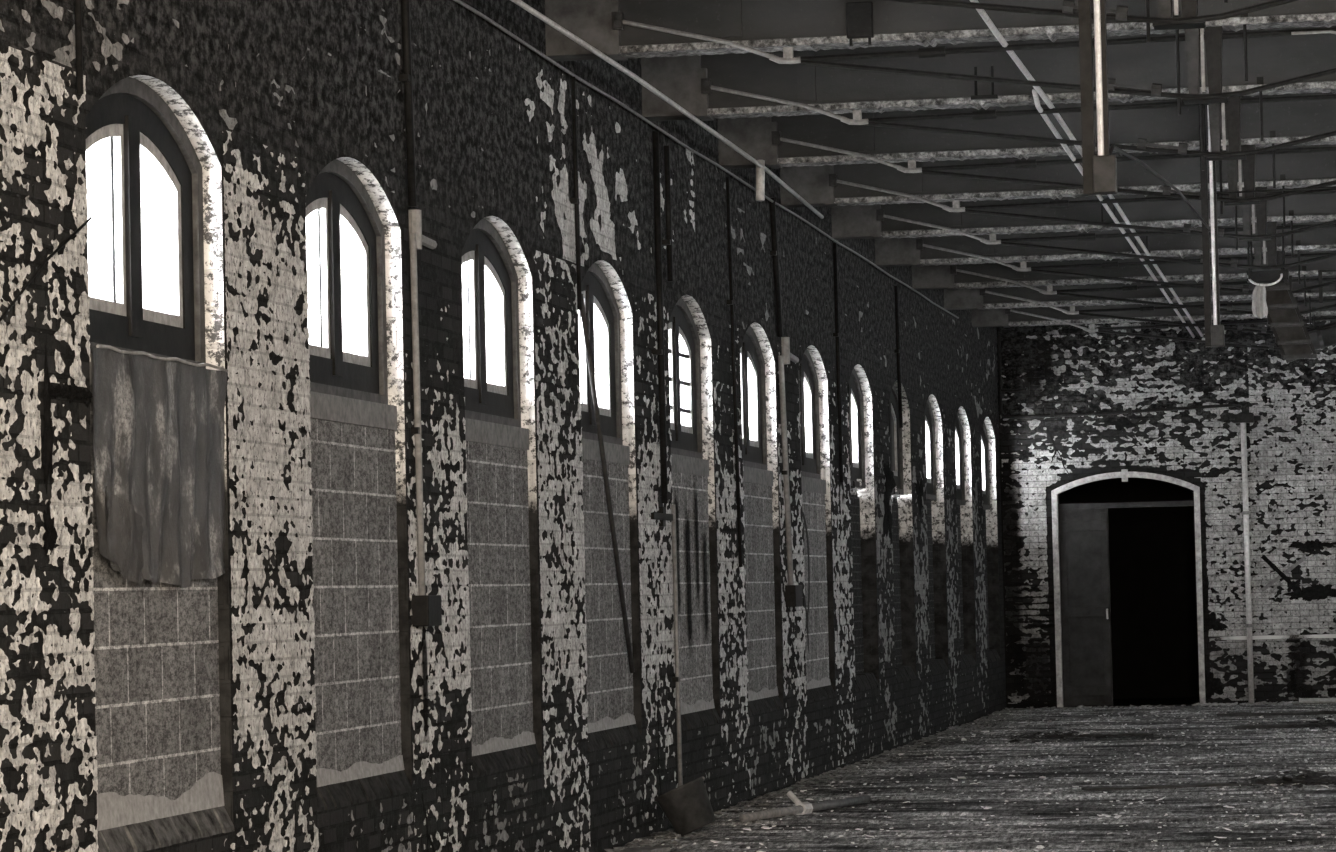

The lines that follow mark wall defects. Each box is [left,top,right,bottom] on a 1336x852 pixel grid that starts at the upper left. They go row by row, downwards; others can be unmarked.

peeling [0,0,134,852]
peeling [212,109,322,852]
peeling [271,73,295,106]
peeling [358,9,417,77]
peeling [380,70,708,852]
peeling [725,203,766,285]
peeling [698,316,1336,806]